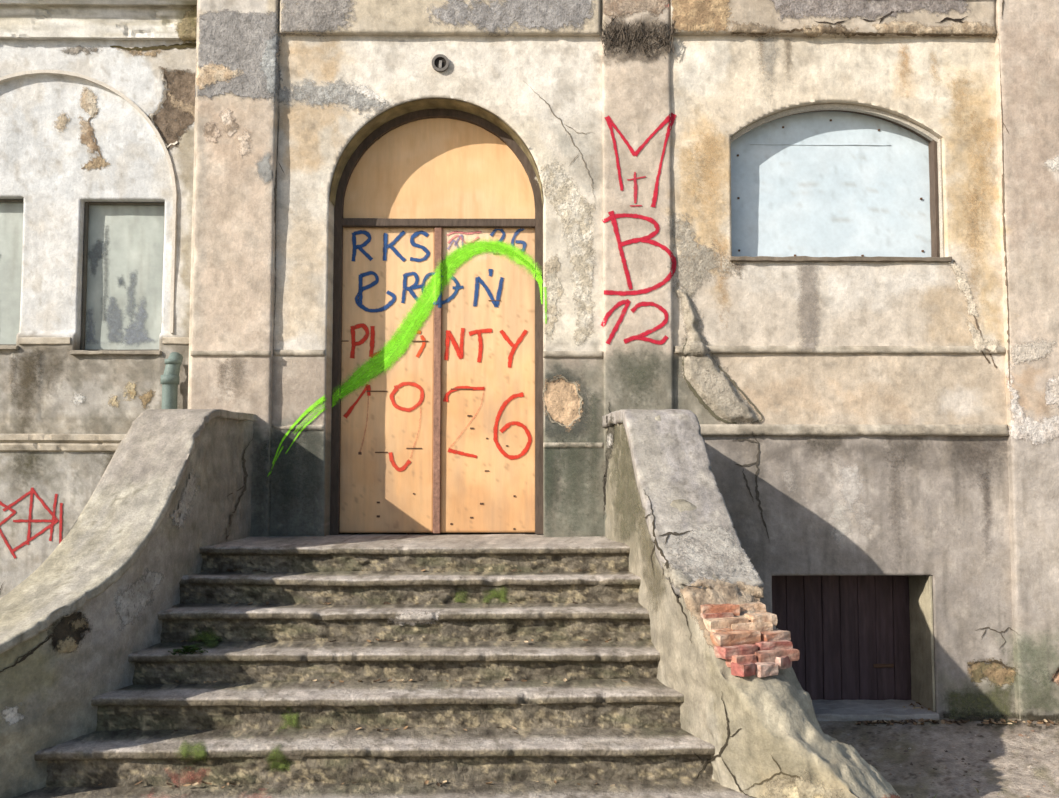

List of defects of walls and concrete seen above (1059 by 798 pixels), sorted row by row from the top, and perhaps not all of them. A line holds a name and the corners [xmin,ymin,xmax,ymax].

peeling [259,35,280,94]
crack [816,10,907,24]
crack [937,15,968,23]
peeling [54,87,110,170]
spalling [148,63,273,182]
crack [523,81,595,208]
spalling [542,370,589,437]
peeling [1005,338,1059,445]
crack [733,432,770,541]
crack [643,489,693,643]
flaking render [661,525,800,678]
crack [977,627,1019,646]